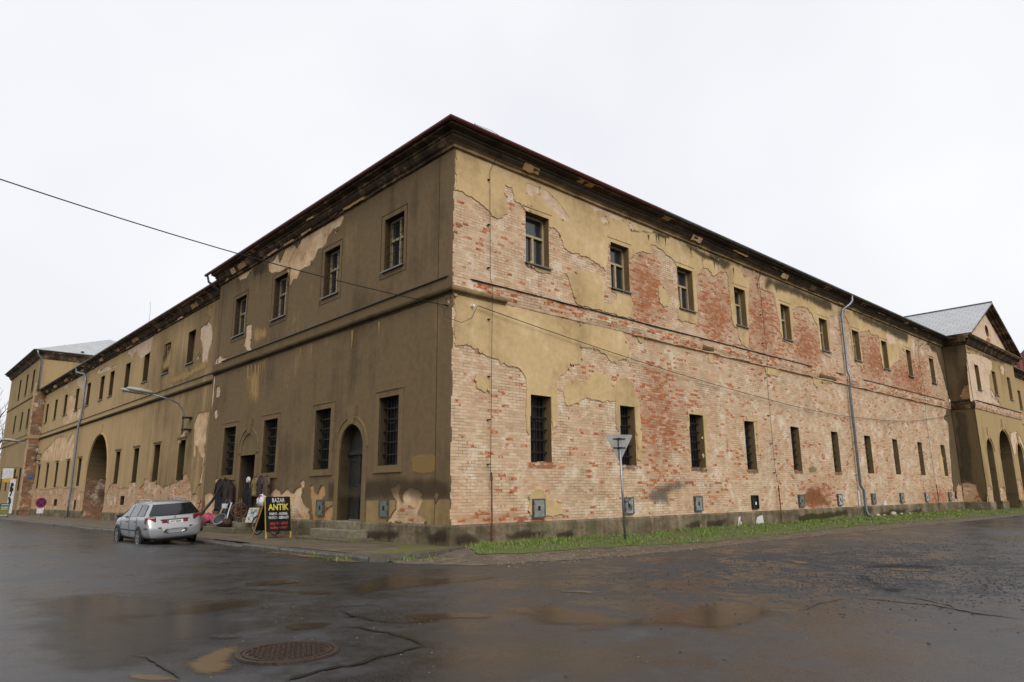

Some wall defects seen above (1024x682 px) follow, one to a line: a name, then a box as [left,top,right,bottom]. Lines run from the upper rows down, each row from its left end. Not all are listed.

spalling [226,216,344,287]
spalling [244,324,252,350]
peeling [445,149,912,469]
spalling [41,287,215,461]
spalling [103,322,226,514]
spalling [270,480,333,520]
spalling [387,490,439,524]
peeling [528,489,564,517]